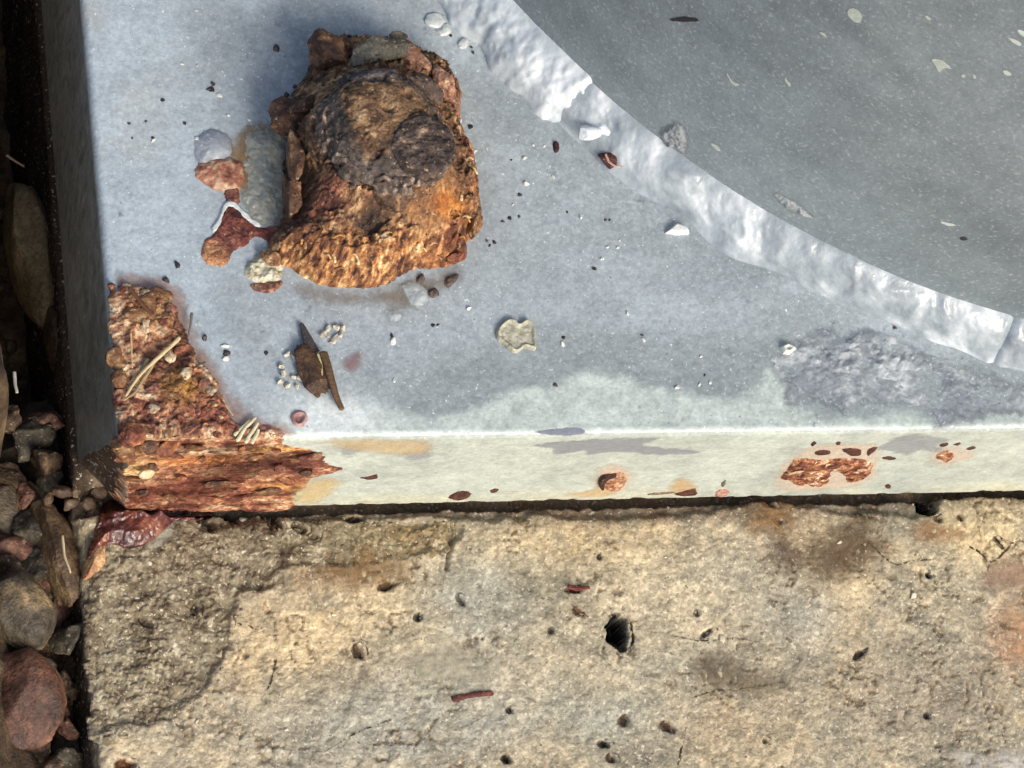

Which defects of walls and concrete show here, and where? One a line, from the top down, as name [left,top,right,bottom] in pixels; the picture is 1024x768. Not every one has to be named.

rust [307,28,461,114]
rust [268,94,315,218]
rust [201,136,281,267]
rust [351,231,405,267]
rust [416,136,481,298]
peeling [665,223,689,235]
rust [82,279,343,580]
rust [779,441,896,490]
rust [936,442,976,464]